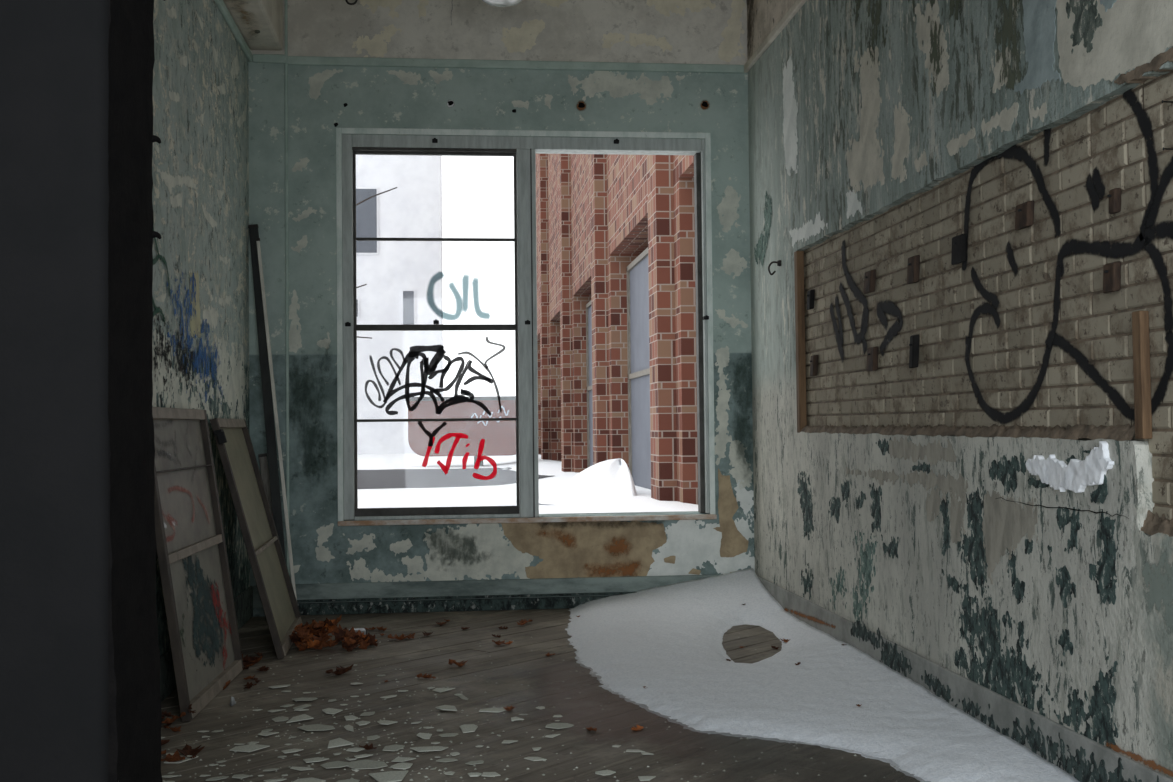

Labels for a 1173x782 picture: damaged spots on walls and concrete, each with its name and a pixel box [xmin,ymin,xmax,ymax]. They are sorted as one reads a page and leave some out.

peeling [568,71,688,111]
peeling [783,54,798,176]
peeling [845,44,928,219]
peeling [911,0,950,98]
peeling [947,0,1173,156]
peeling [153,143,217,228]
peeling [789,212,828,248]
flaking render [315,346,755,582]
peeling [798,471,815,540]
peeling [801,563,814,600]
peeling [828,436,1142,782]